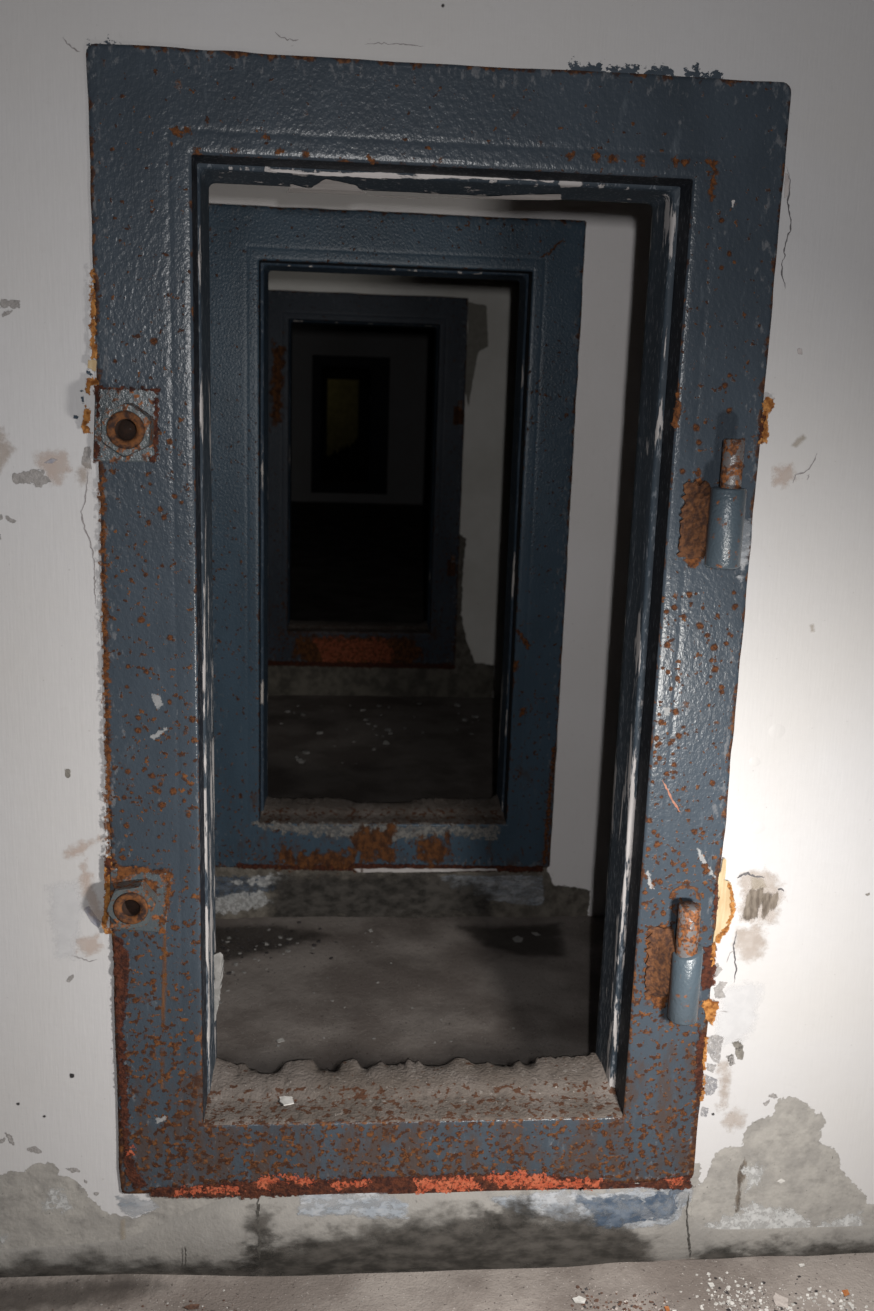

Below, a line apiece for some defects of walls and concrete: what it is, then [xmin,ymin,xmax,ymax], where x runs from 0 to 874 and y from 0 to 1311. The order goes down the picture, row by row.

corrosion [742,397,775,468]
peeling [12,469,51,488]
corrosion [664,591,738,707]
corrosion [81,268,719,1200]
peeling [712,858,736,944]
peeling [701,1035,744,1117]
peeling [691,1093,874,1229]